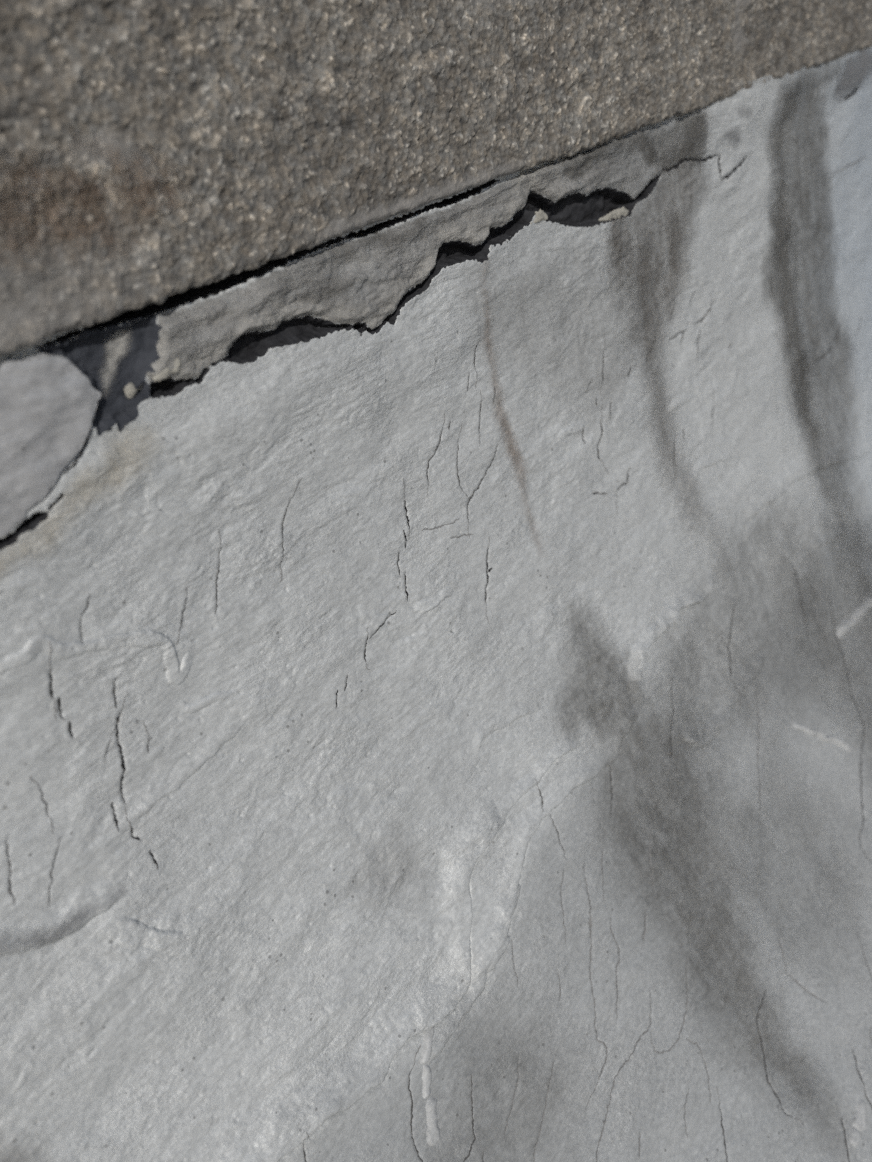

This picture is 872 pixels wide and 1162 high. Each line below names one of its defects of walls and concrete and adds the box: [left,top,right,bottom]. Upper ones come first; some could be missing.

spalling [39,117,703,436]
damp [770,75,843,432]
crack [0,428,92,550]
crack [176,531,222,645]
crack [280,480,301,580]
crack [336,335,503,708]
crack [583,291,717,510]
crack [49,642,73,738]
crack [104,679,158,869]
crack [533,780,728,1162]
crack [408,1046,423,1162]
crack [464,1058,520,1162]